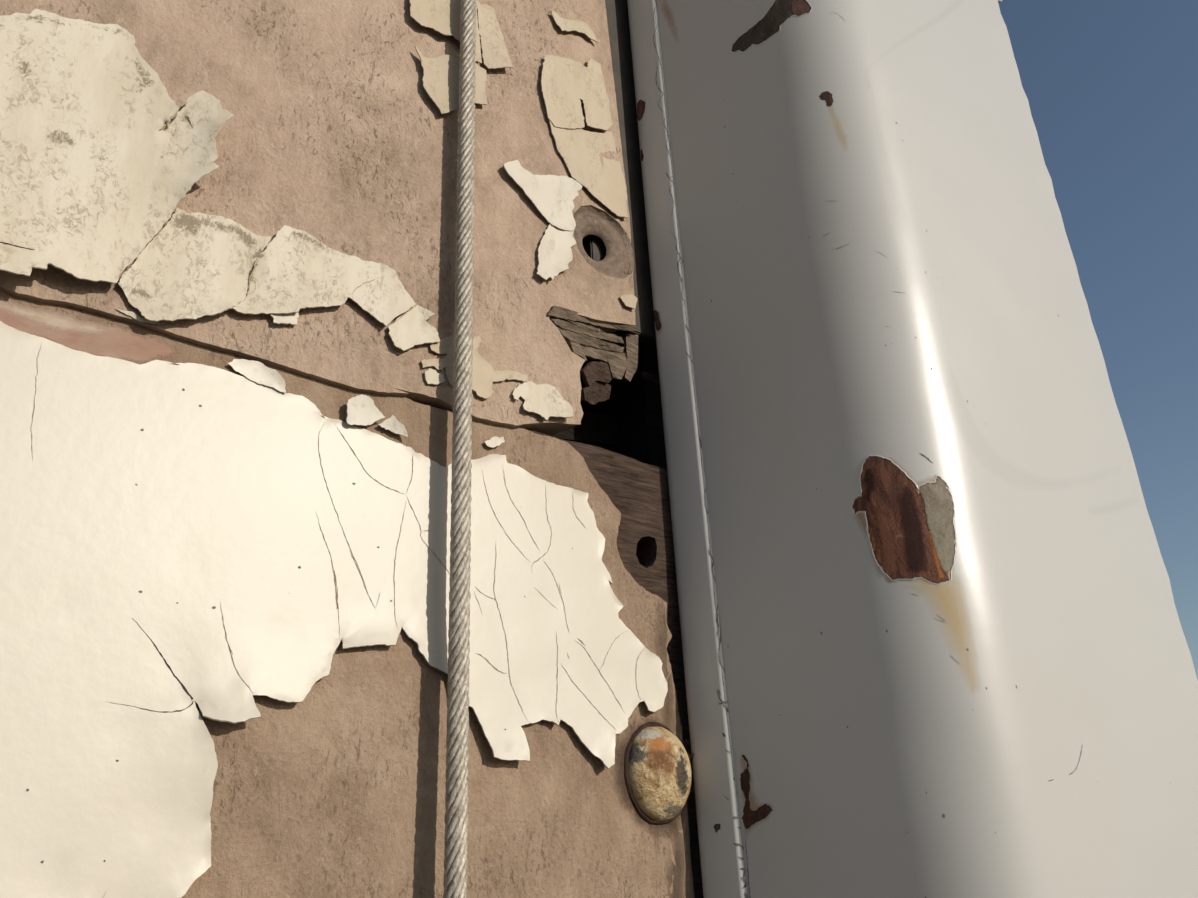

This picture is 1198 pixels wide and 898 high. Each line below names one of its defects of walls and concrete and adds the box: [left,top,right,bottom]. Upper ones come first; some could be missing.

peeling [409,0,513,114]
corrosion [819,91,834,107]
peeling [503,55,628,280]
spalling [472,306,660,421]
peeling [0,9,455,898]
crack [316,422,450,634]
corrosion [851,455,957,586]
crack [105,618,194,713]
crack [220,603,251,690]
crack [474,470,641,733]
peeling [467,436,670,898]
corrosion [740,755,772,829]